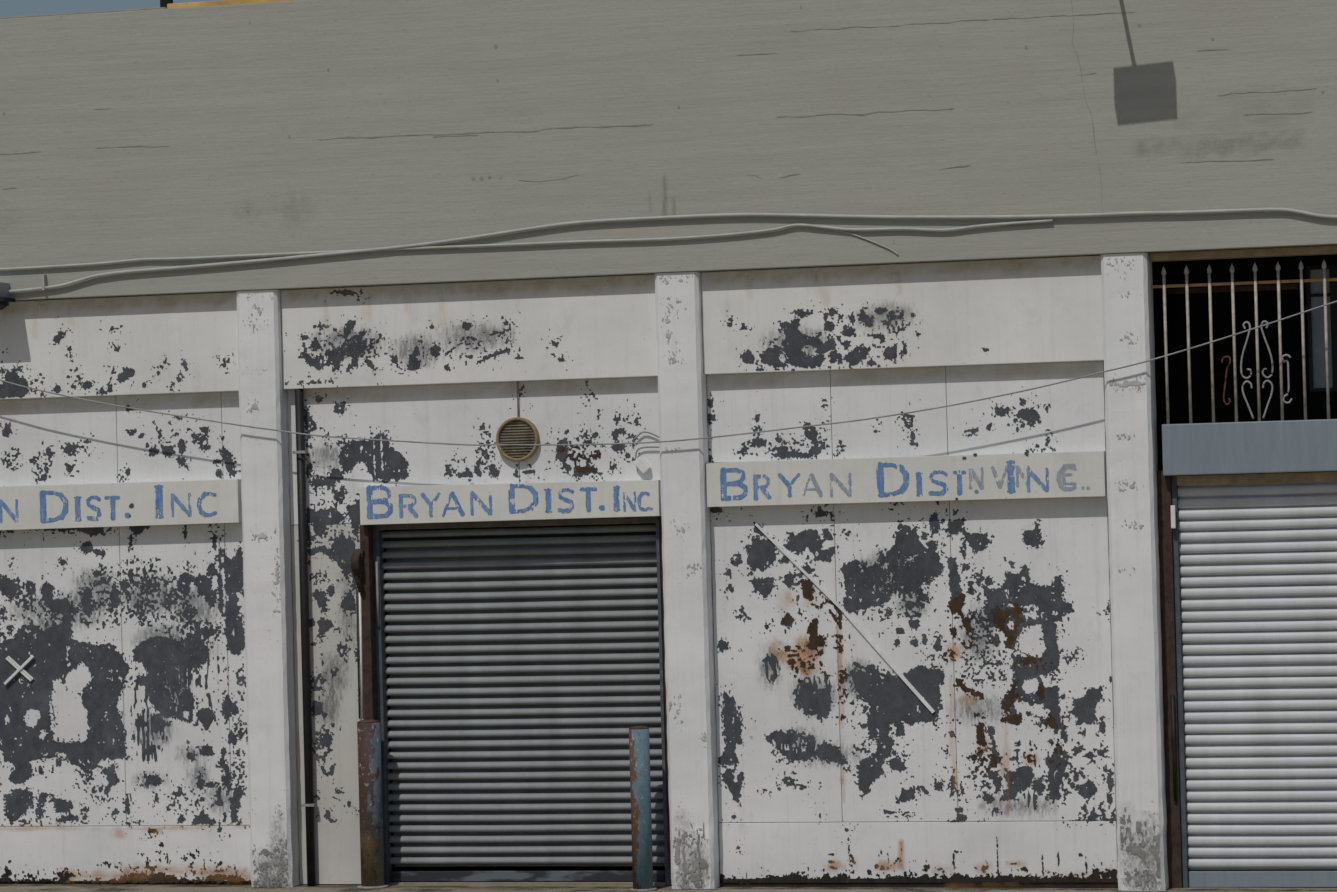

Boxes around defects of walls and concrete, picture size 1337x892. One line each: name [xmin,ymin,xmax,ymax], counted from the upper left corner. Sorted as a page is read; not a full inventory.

crack [736,0,1132,203]
peeling [0,320,241,483]
peeling [444,381,651,482]
peeling [720,298,921,371]
peeling [0,503,281,841]
peeling [284,287,524,825]
rust [759,578,854,722]
peeling [701,498,1160,887]
rust [941,585,1068,793]
spalling [252,837,288,888]